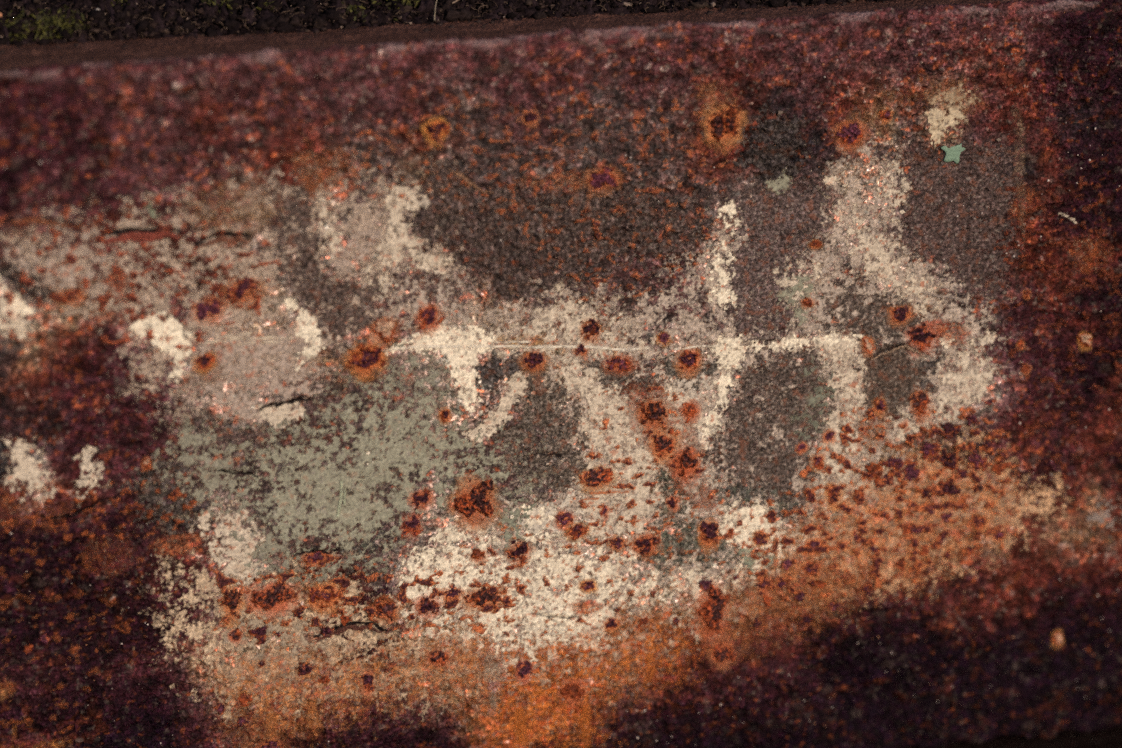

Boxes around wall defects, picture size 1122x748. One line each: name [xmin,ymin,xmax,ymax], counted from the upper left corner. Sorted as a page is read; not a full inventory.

corrosion [699,104,741,150]
corrosion [472,100,719,301]
corrosion [679,350,700,373]
peeling [956,431,985,445]
peeling [0,436,56,506]
peeling [72,445,109,500]
corrosion [0,456,202,571]
peeling [1087,497,1122,532]
corrosion [206,356,1020,748]
peeling [919,514,973,579]
peeling [720,594,763,625]
corrosion [1052,632,1063,645]